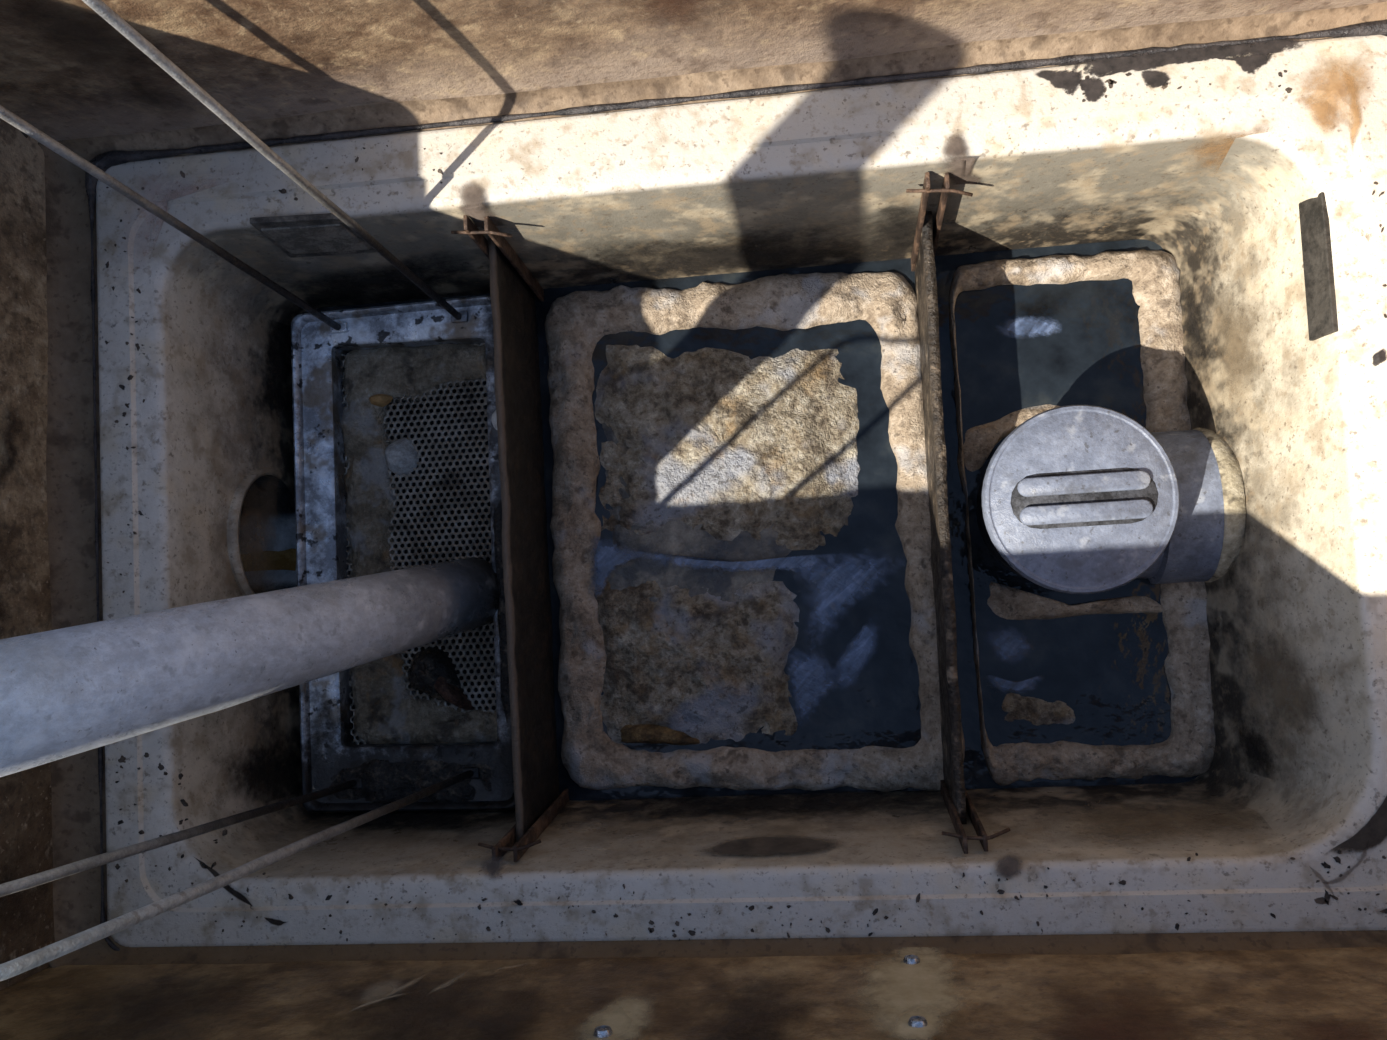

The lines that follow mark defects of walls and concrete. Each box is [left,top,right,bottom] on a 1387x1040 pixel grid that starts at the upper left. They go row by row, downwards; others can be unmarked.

water stain [18,5,139,66]
corrosion [459,185,503,229]
water stain [0,406,20,483]
water stain [1235,721,1272,774]
water stain [710,836,837,855]
water stain [0,874,22,920]
water stain [349,979,531,1040]
water stain [585,999,648,1040]
water stain [863,947,960,1039]